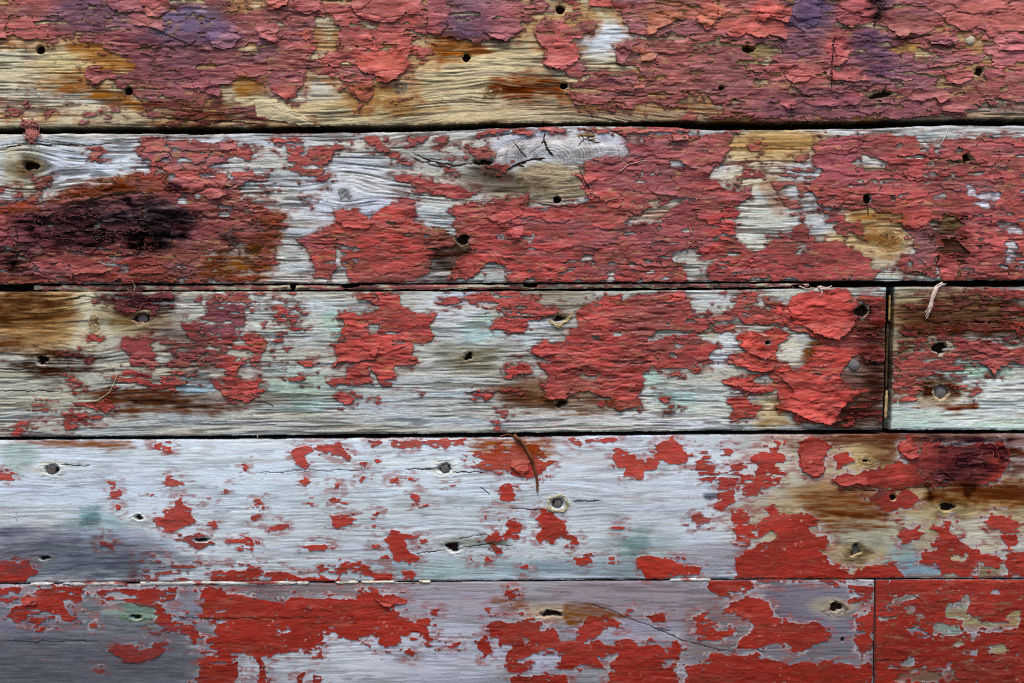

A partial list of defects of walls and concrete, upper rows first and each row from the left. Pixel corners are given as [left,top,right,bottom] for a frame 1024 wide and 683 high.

rust [490,72,562,102]
crack [411,153,469,168]
crack [507,133,553,171]
leakage [14,196,198,250]
leakage [0,248,30,269]
peeling [0,0,1024,514]
rust [1008,448,1024,470]
rust [913,479,1024,505]
peeling [152,494,195,534]
rust [808,496,888,533]
peeling [474,435,1024,683]
peeling [0,530,446,683]